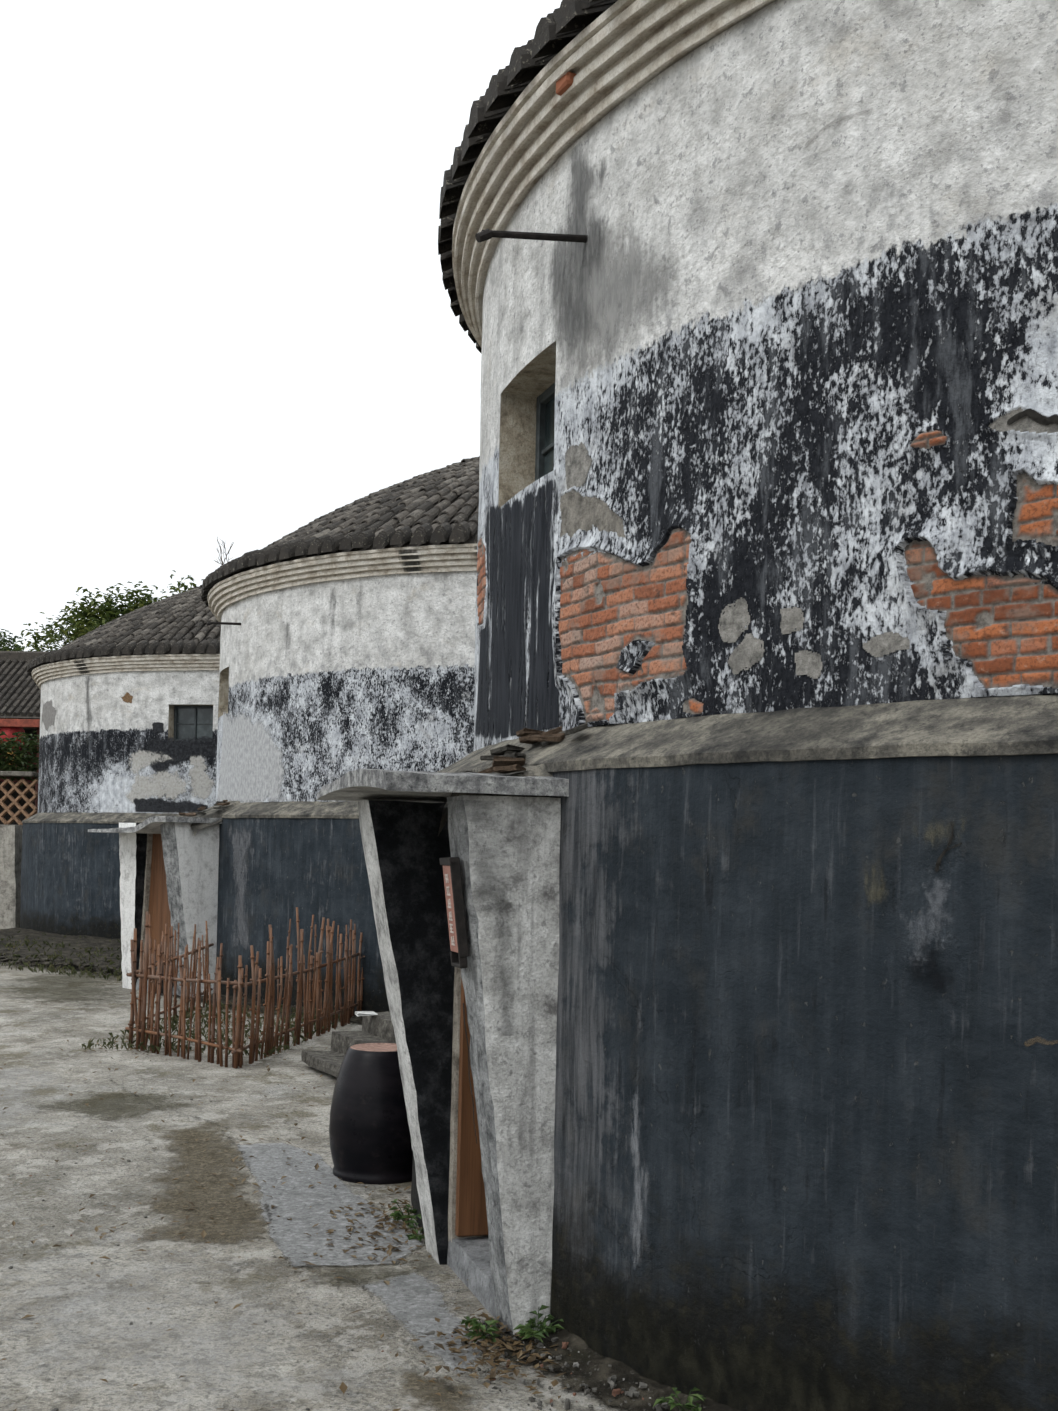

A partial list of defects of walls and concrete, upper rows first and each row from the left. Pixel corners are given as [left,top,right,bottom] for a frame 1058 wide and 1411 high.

water stain [551,151,666,364]
flaking render [548,442,765,728]
flaking render [855,395,1058,700]
spalling [126,750,215,803]
water stain [133,798,208,812]
water stain [147,722,217,773]
water stain [550,1278,880,1411]